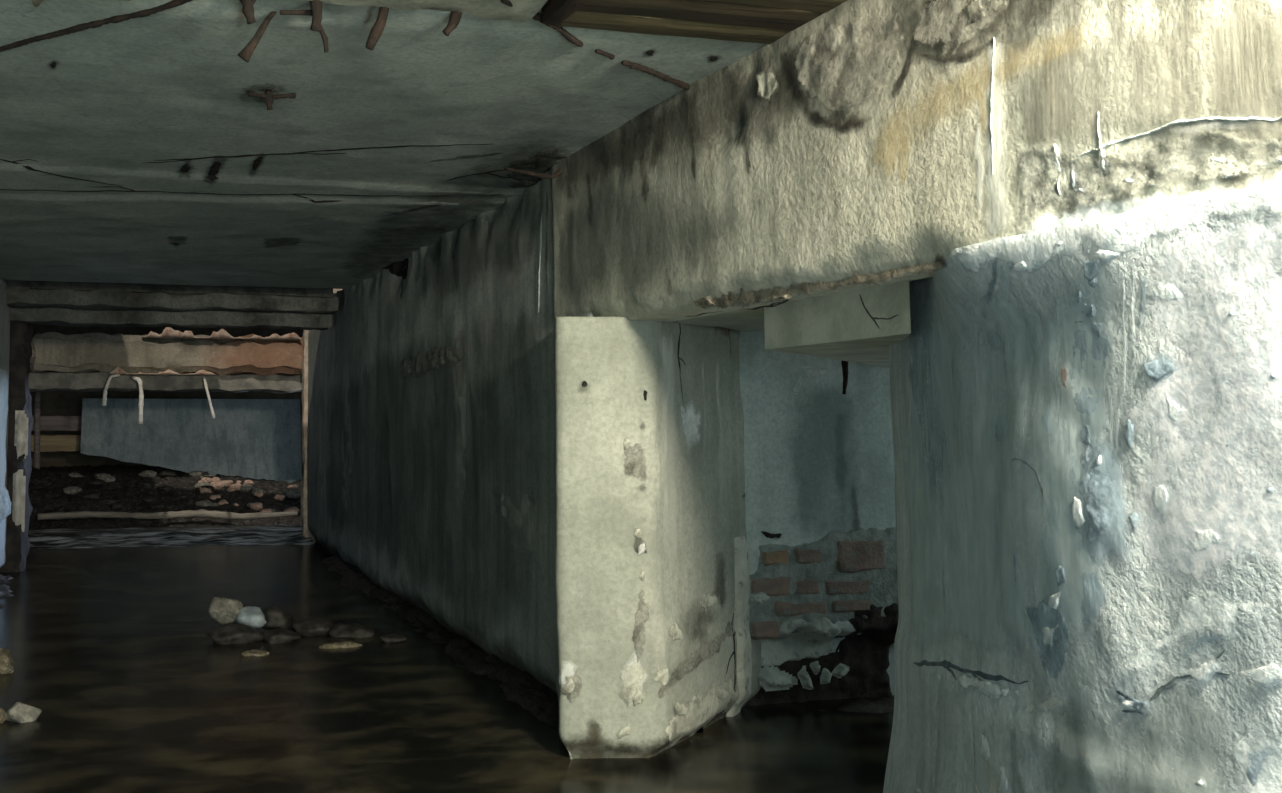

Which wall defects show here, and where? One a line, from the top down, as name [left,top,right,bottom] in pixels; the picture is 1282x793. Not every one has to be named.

peeling [756,0,1007,133]
leakage [559,52,796,224]
peeling [693,131,1282,678]
flaking render [620,527,899,746]
spalling [560,671,582,702]
crack [913,660,1028,699]
spalling [1116,683,1177,715]
peeling [1195,662,1218,683]
peeling [1244,664,1282,687]
peeling [1235,738,1282,793]